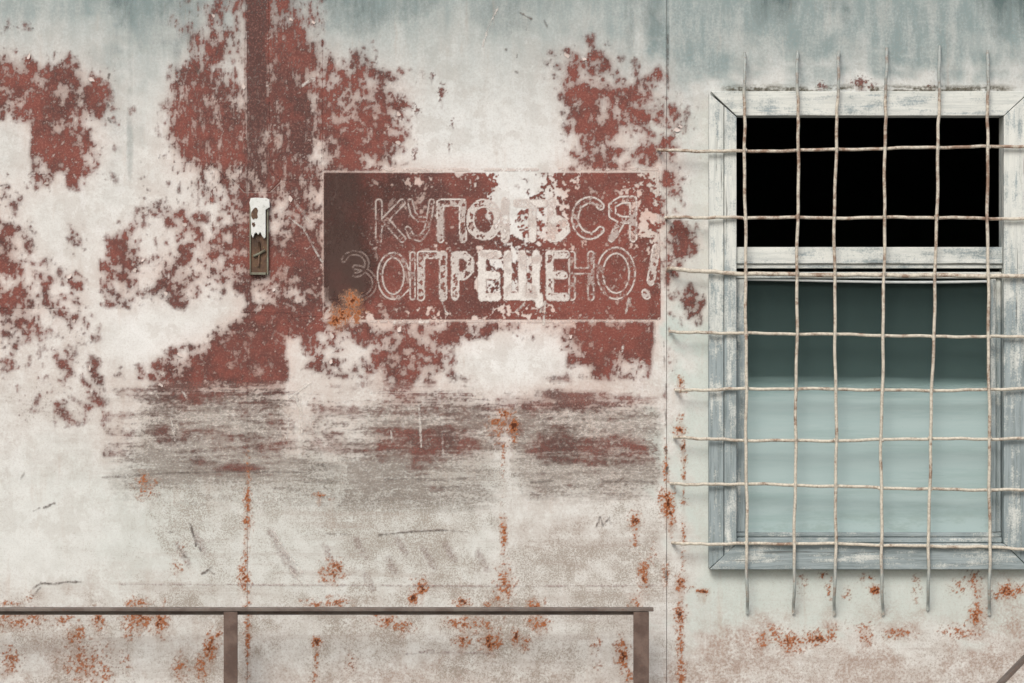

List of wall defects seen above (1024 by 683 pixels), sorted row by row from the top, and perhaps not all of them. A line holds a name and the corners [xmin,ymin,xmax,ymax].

peeling [0,51,120,191]
peeling [547,34,706,326]
peeling [0,184,99,373]
peeling [53,0,659,504]
rust [0,596,112,683]
rust [407,578,429,605]
rust [444,597,551,654]
rust [483,517,518,607]
rust [591,637,633,681]
rust [658,414,708,683]
rust [756,624,836,653]
rust [942,572,984,637]